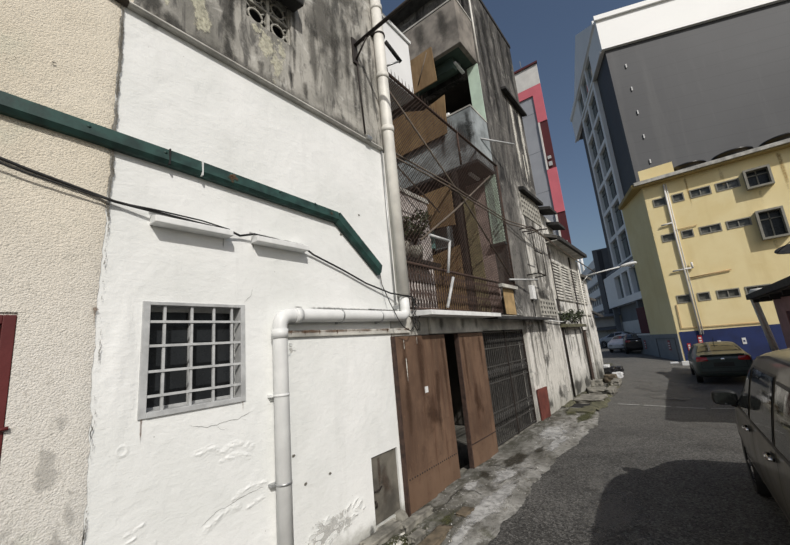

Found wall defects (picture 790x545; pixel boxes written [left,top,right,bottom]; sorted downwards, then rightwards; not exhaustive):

damp [223,0,234,56]
damp [476,13,513,108]
peeling [309,497,366,545]